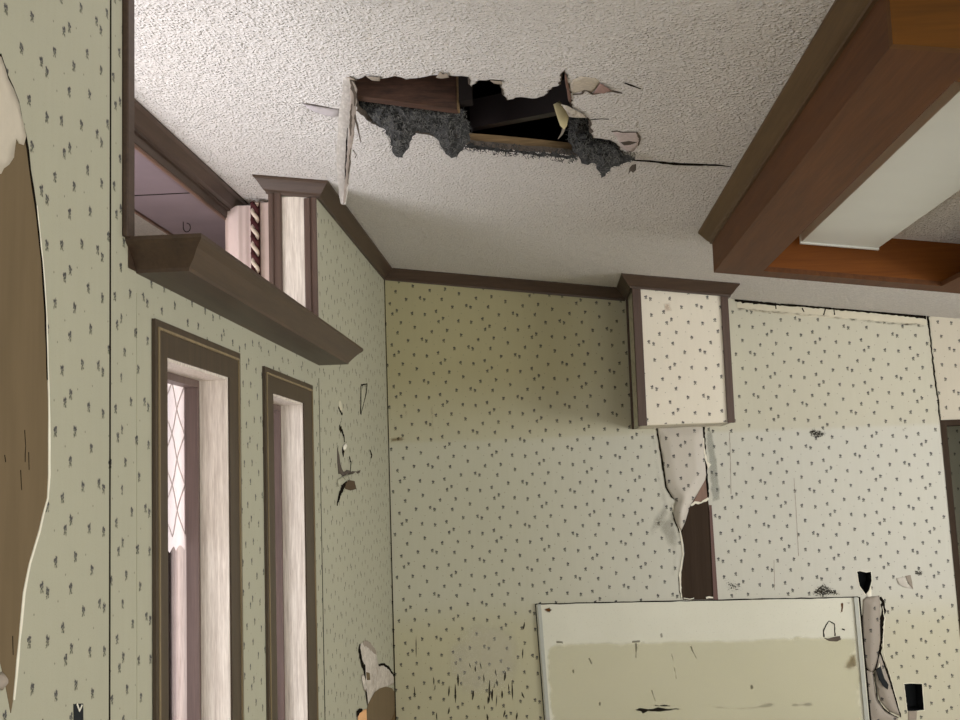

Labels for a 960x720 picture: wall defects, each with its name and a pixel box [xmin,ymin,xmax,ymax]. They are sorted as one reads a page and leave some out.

peeling [570,76,622,95]
peeling [553,101,587,129]
peeling [611,131,641,152]
crack [634,159,731,167]
spalling [858,571,872,594]